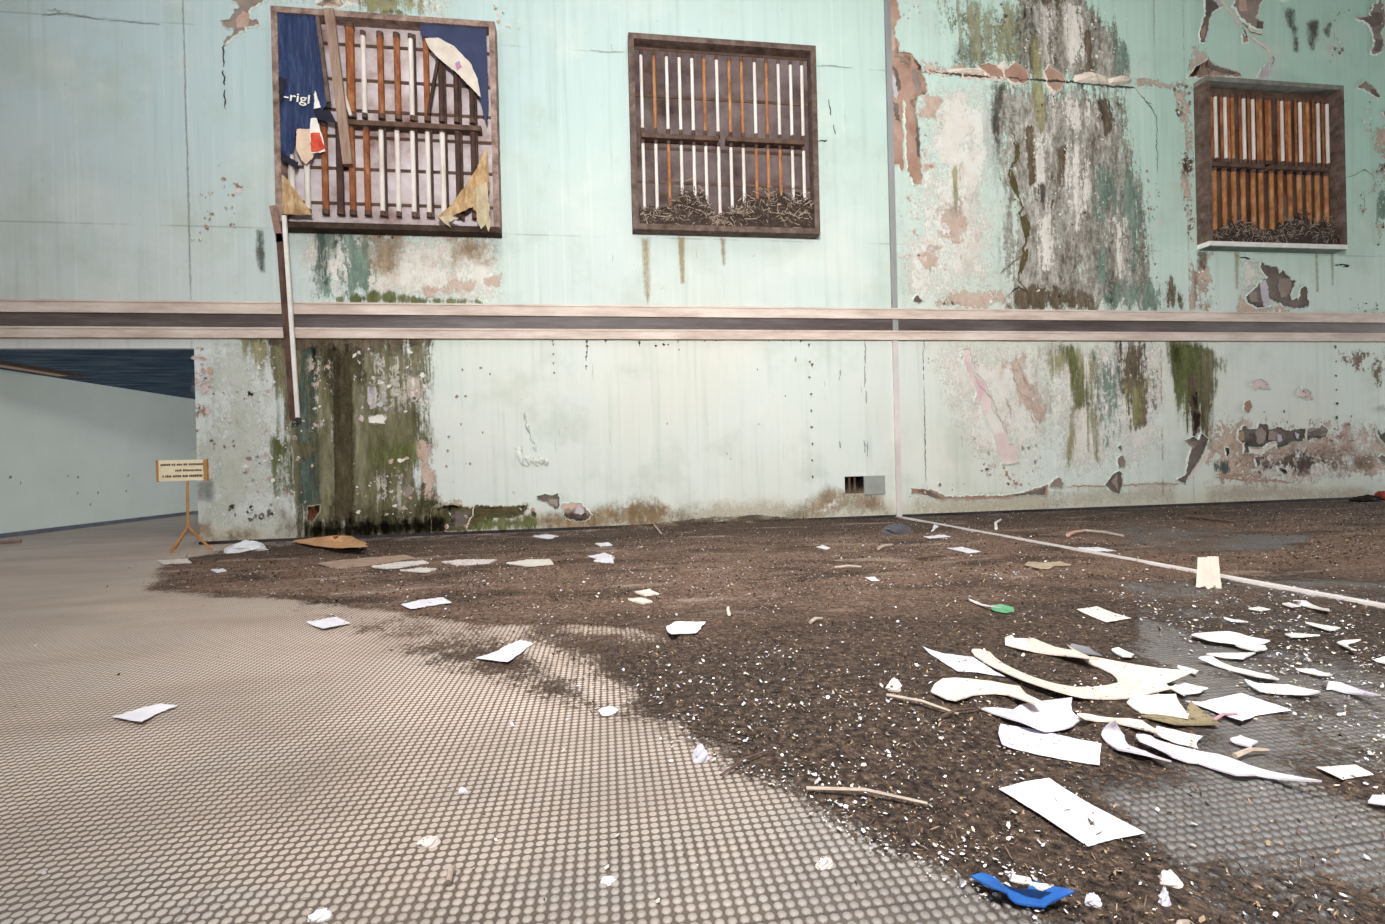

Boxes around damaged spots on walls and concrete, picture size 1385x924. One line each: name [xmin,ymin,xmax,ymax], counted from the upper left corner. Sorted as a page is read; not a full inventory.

water stain [314,0,446,15]
peeling [1024,12,1127,75]
peeling [1329,0,1385,62]
peeling [891,0,1020,309]
water stain [940,0,1183,311]
peeling [1134,0,1289,311]
peeling [1237,262,1310,312]
water stain [241,339,446,538]
water stain [1050,341,1149,465]
peeling [154,346,1385,919]